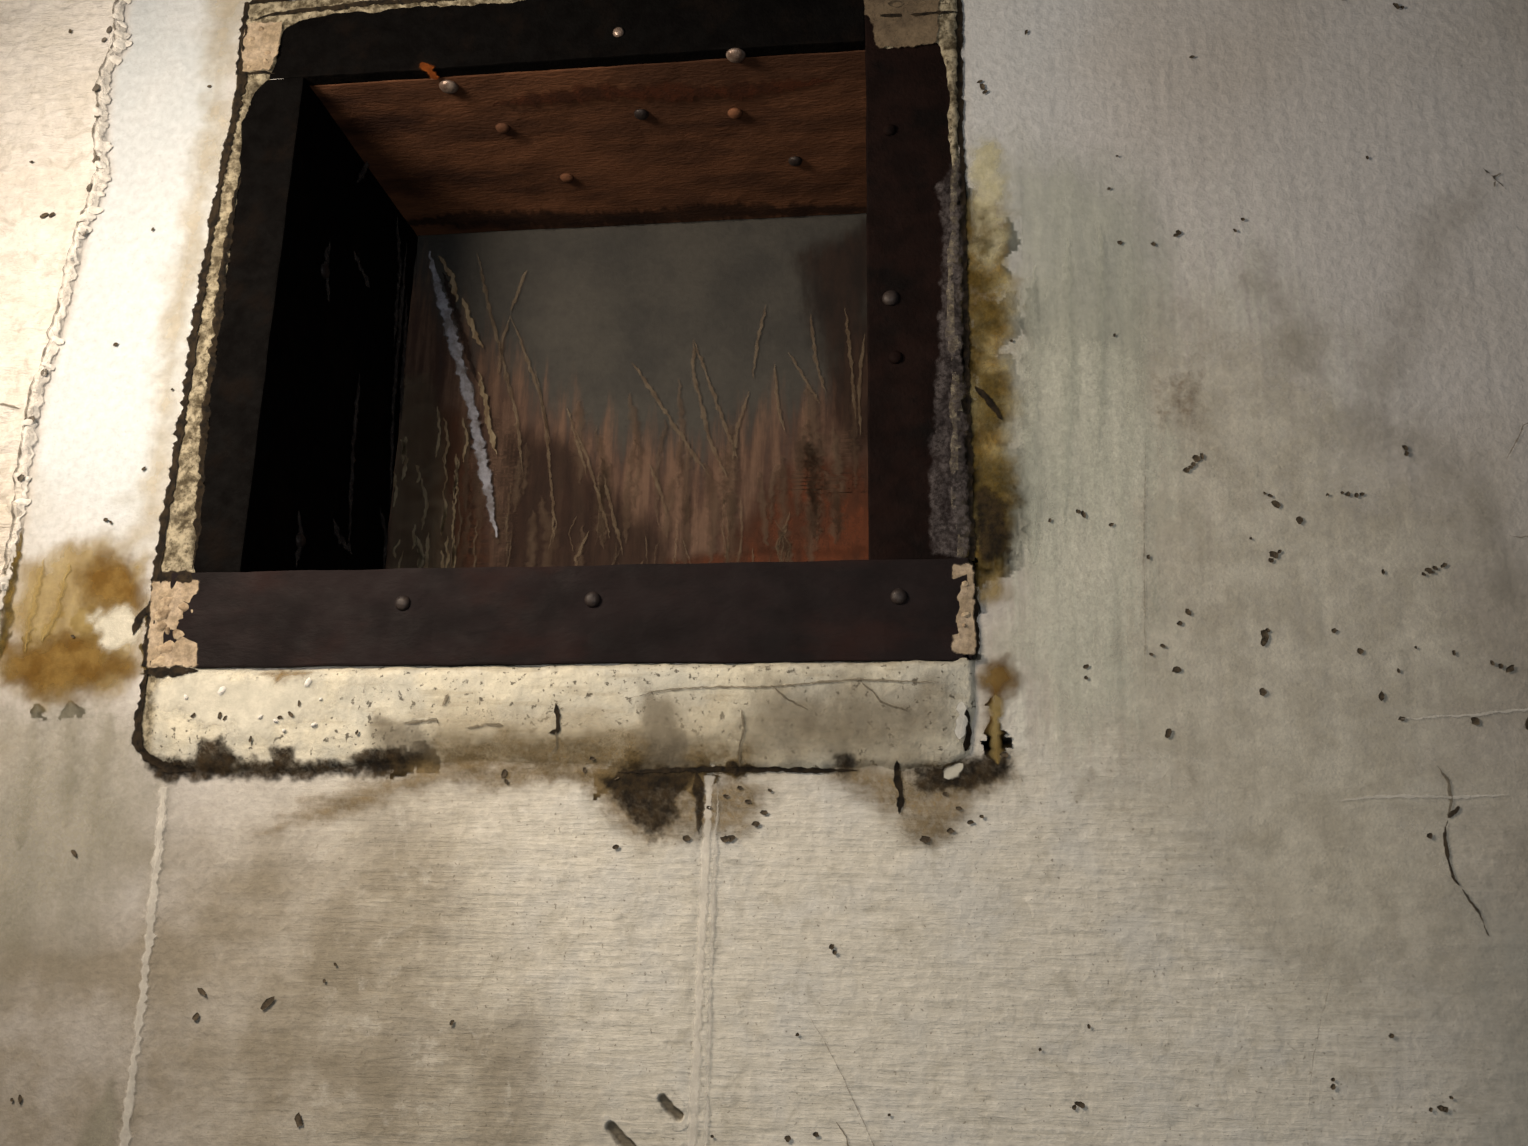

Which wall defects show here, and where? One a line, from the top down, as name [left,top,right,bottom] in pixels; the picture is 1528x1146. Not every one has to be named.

peeling [147,580,368,742]
damp [146,696,772,843]
damp [766,688,1011,843]
corrosion [980,661,1018,764]
crack [1438,767,1489,935]